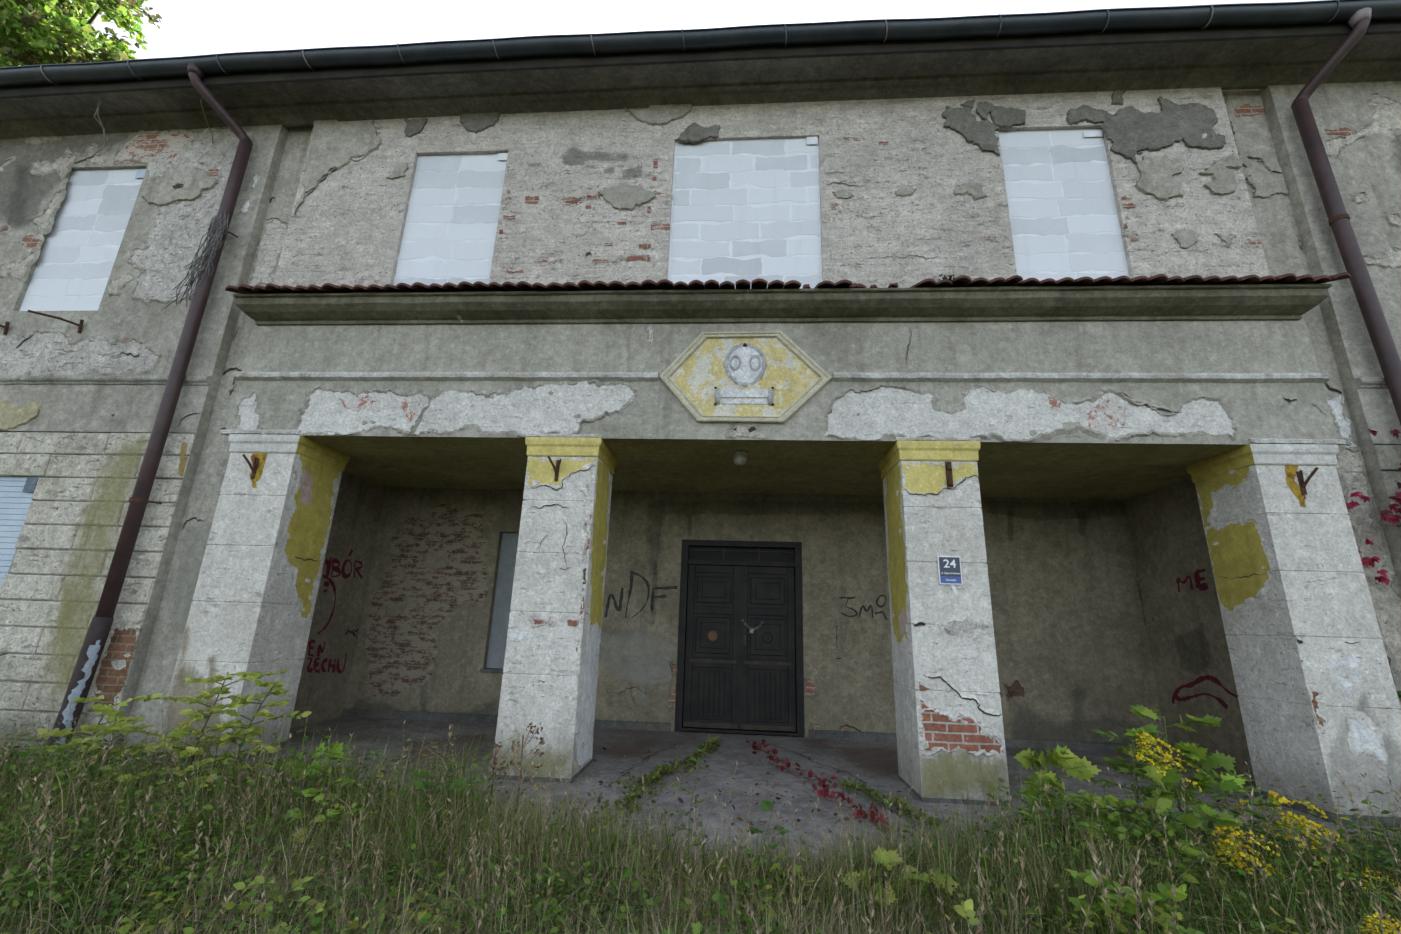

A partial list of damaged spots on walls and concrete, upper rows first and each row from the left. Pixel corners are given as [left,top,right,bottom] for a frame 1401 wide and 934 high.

flaking render [1223,94,1265,119]
spalling [0,126,261,306]
spalling [247,202,301,286]
spalling [293,380,641,437]
spalling [822,382,1238,443]
peeling [281,454,342,635]
peeling [1195,465,1273,616]
flaking render [51,623,142,761]
flaking render [918,682,1006,760]
crack [923,670,1002,716]